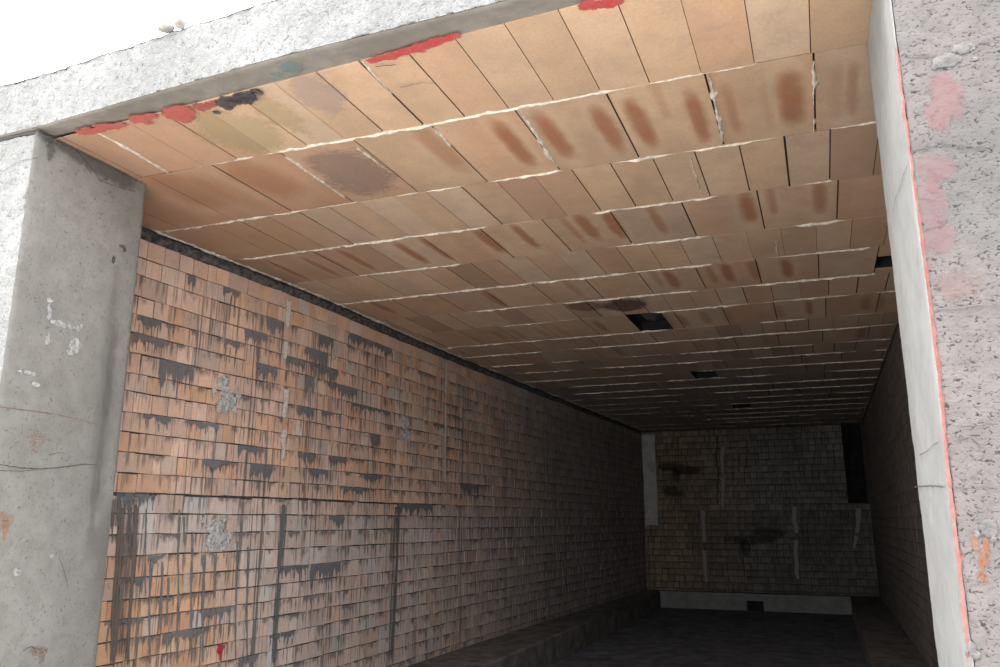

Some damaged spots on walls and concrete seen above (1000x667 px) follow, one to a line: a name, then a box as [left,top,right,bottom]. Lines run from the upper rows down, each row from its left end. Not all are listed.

spalling [212,376,241,414]
leakage [281,389,289,460]
crack [0,452,97,472]
leakage [110,501,138,667]
spalling [200,514,239,553]
leakage [274,505,284,667]
leakage [388,507,400,663]
rust [971,531,989,583]